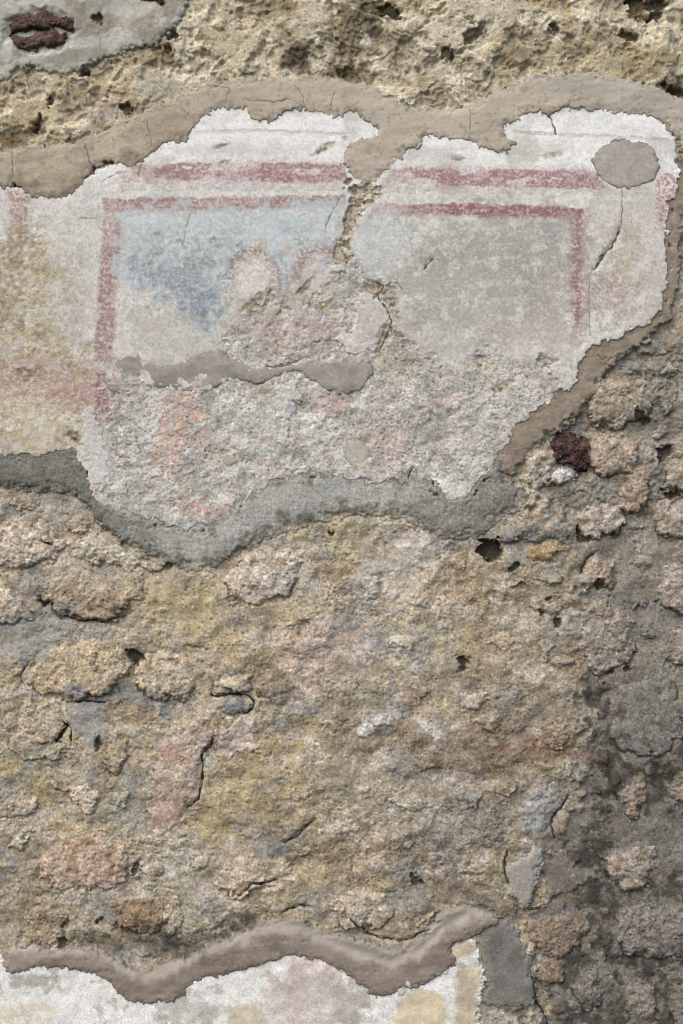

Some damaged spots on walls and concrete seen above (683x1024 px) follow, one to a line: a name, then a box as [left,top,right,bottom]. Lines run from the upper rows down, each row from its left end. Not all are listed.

crack [588,190,623,322]
peeling [282,698,318,717]
crack [187,737,215,808]
peeling [143,710,259,847]
peeling [518,779,564,837]
crack [550,796,568,838]